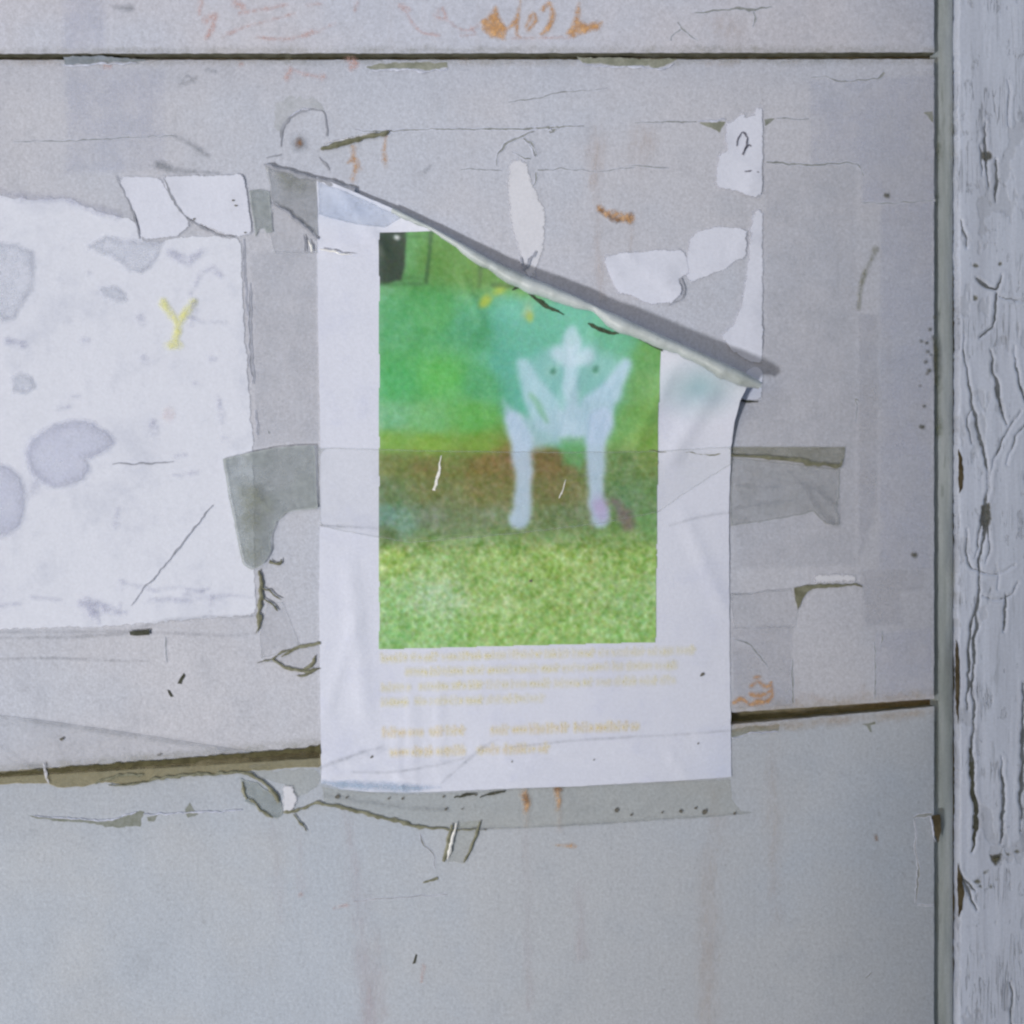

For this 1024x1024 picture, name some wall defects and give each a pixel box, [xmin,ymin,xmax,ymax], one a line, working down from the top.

corrosion [598,207,633,223]
peeling [28,803,242,828]
crack [419,833,436,869]